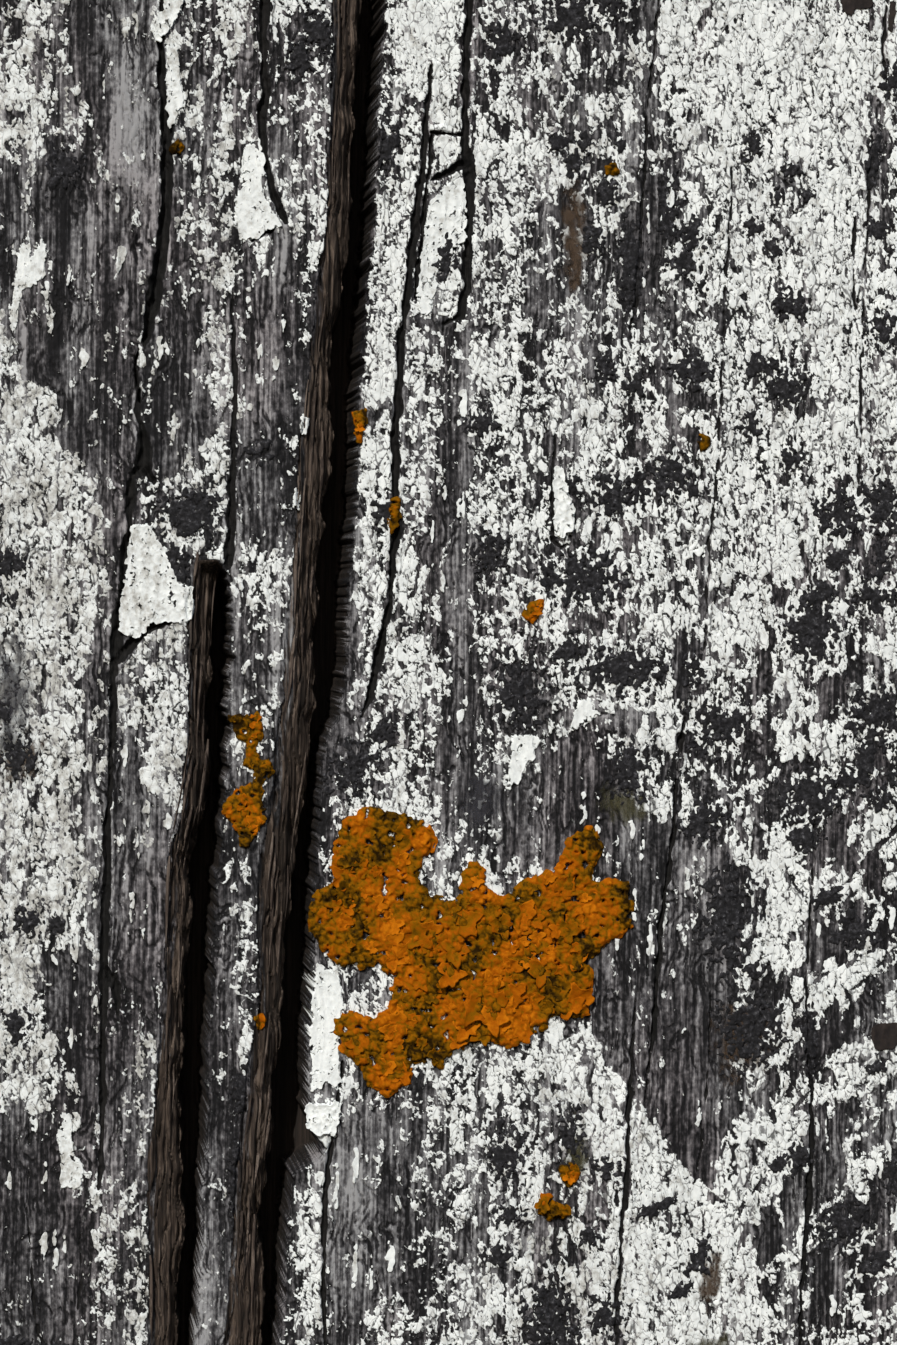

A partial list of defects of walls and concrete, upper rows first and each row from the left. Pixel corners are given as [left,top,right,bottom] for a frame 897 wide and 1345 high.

peeling [0,932,100,1345]
peeling [0,0,195,638]
peeling [111,722,179,1002]
peeling [148,285,211,495]
peeling [234,138,309,548]
crack [97,0,476,1345]
peeling [301,963,427,1345]
peeling [416,177,467,315]
peeling [416,336,481,830]
peeling [497,698,743,1190]
crack [614,719,685,1345]
peeling [805,895,897,1055]